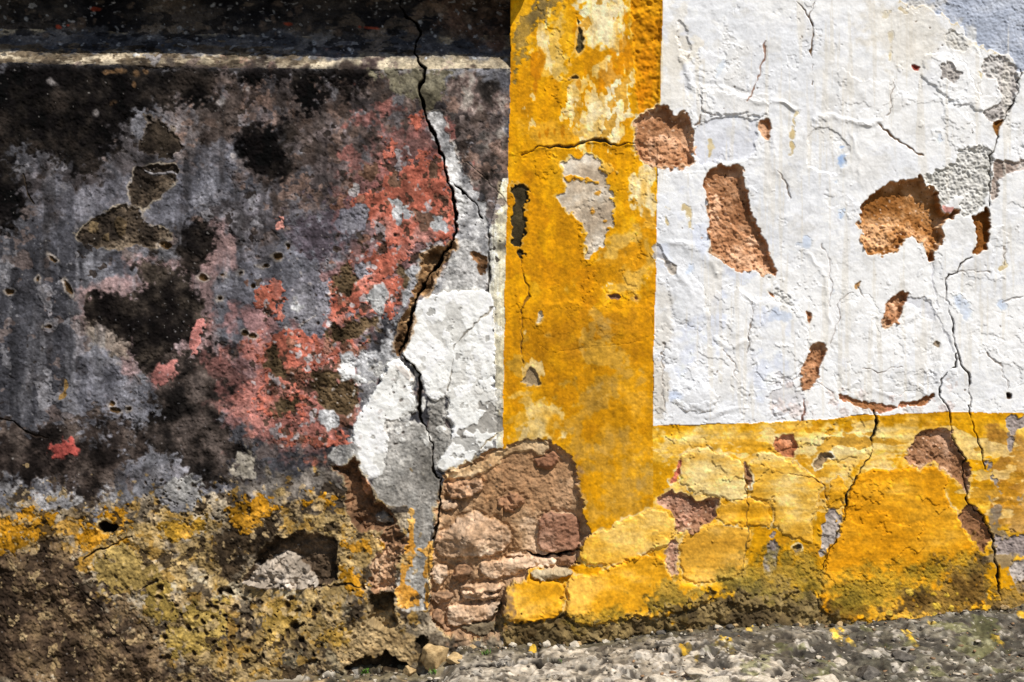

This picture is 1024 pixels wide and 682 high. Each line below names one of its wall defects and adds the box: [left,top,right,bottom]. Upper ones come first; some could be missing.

crack [394,0,510,541]
crack [521,138,635,156]
peeling [556,153,619,260]
spalling [630,0,778,278]
crack [821,243,871,344]
spalling [856,145,1024,263]
flaking render [901,0,1024,135]
flaking render [223,136,592,675]
crack [931,245,1010,589]
damp [0,532,247,682]
damp [203,518,286,588]
crack [776,410,879,600]